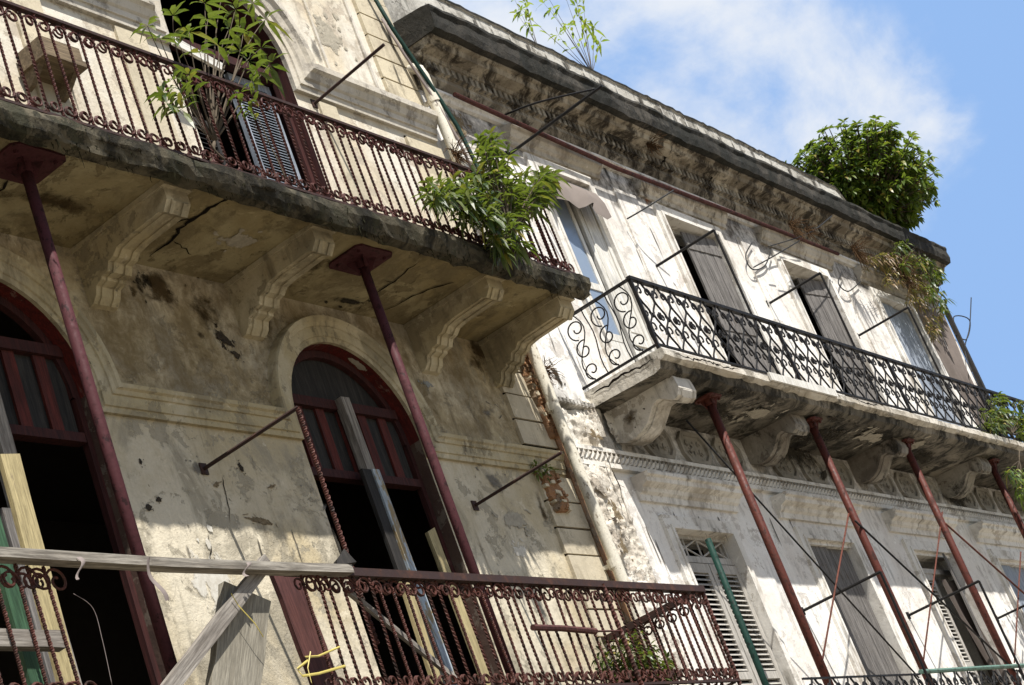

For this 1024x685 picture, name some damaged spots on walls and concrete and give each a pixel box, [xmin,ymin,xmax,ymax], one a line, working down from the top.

crack [150,199,227,256]
damp [130,272,175,303]
crack [378,264,450,310]
flaking render [520,355,560,439]
peeling [727,403,790,425]
peeling [849,426,884,449]
flaking render [533,469,572,513]
spalling [604,487,633,561]